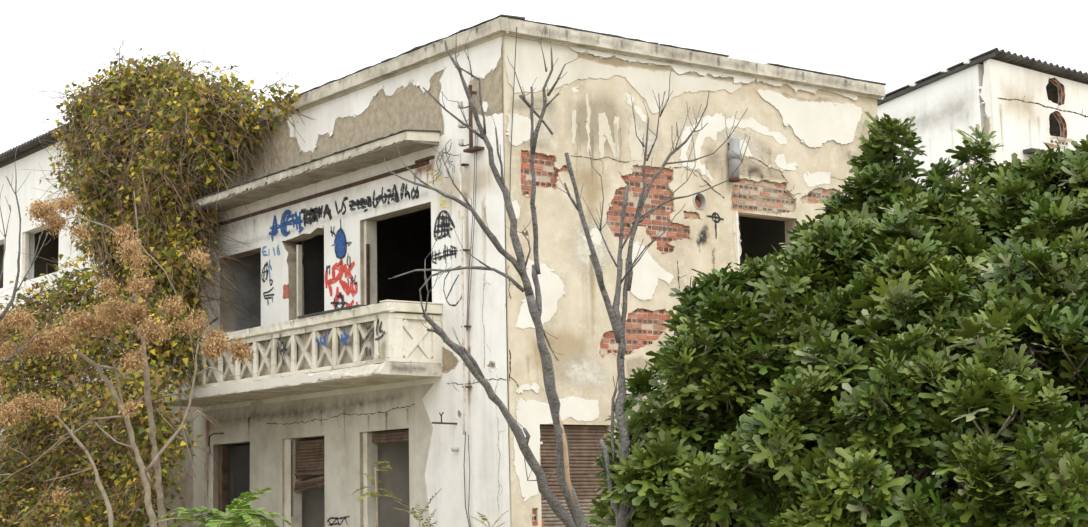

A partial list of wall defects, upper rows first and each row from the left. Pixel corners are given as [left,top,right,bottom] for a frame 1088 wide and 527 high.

flaking render [205,66,446,194]
flaking render [467,60,569,219]
crack [999,96,1088,118]
flaking render [513,82,862,526]